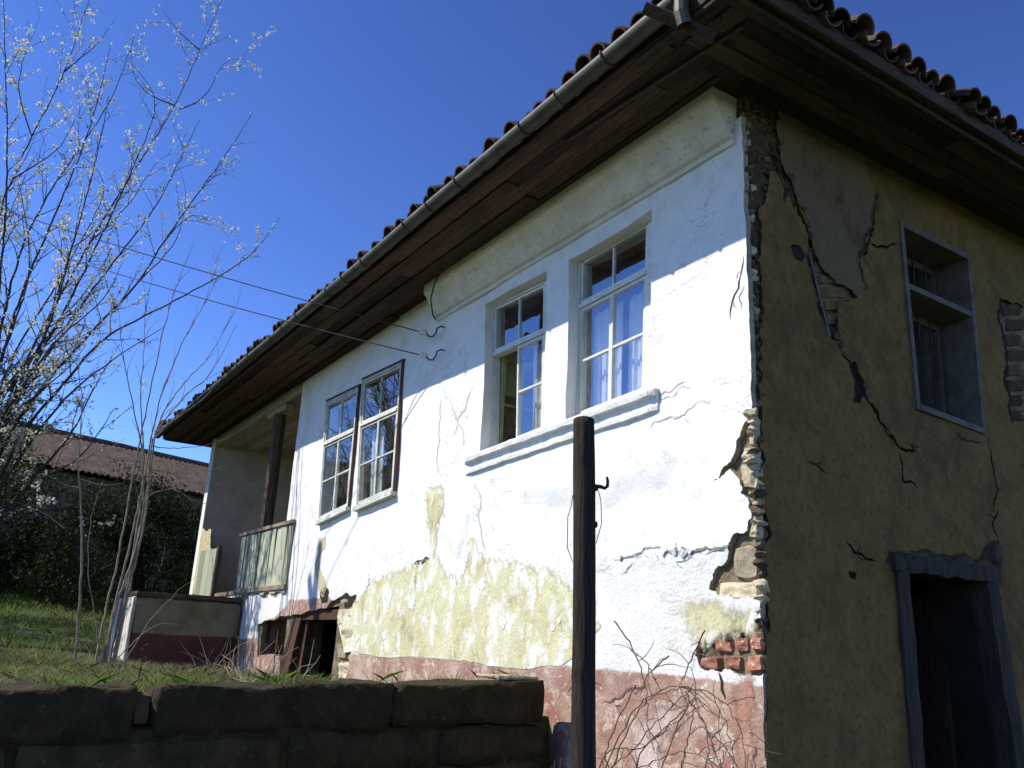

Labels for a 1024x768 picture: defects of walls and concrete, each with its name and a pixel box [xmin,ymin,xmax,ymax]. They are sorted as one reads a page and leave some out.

crack [759,107,814,238]
crack [860,213,892,271]
crack [730,259,744,312]
flaking render [997,297,1024,423]
crack [647,381,716,429]
peeling [695,96,878,768]
crack [833,331,917,452]
crack [599,543,730,574]
leakage [685,600,757,647]